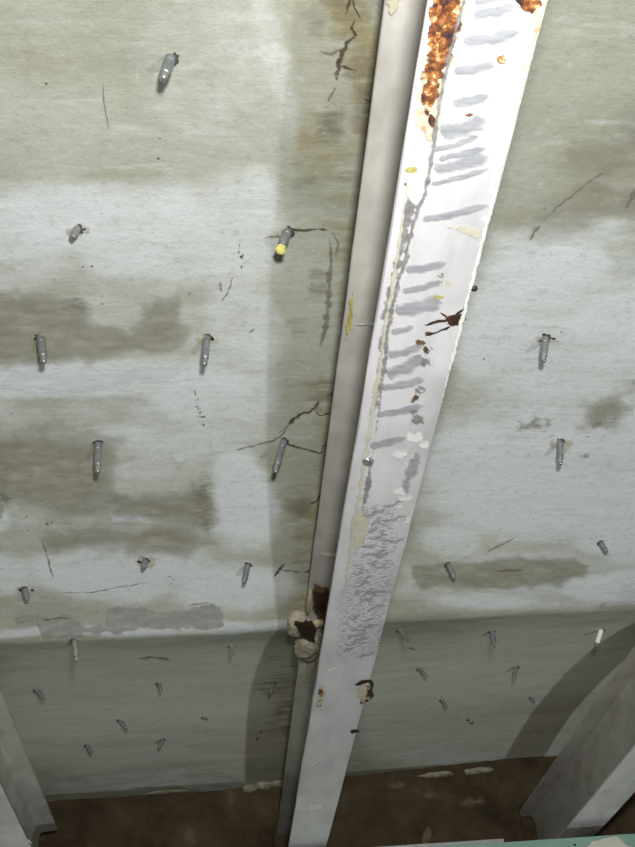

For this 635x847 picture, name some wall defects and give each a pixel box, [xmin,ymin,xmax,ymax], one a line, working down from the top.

crack [321,0,360,100]
corrosion [415,0,467,141]
corrosion [516,0,548,70]
crack [266,228,339,341]
leakage [0,296,186,358]
corrosion [414,309,466,367]
crack [238,391,334,454]
corrosion [411,386,425,424]
leakage [0,440,214,525]
leakage [413,559,586,588]
peeling [16,602,224,638]
spalling [294,618,317,642]